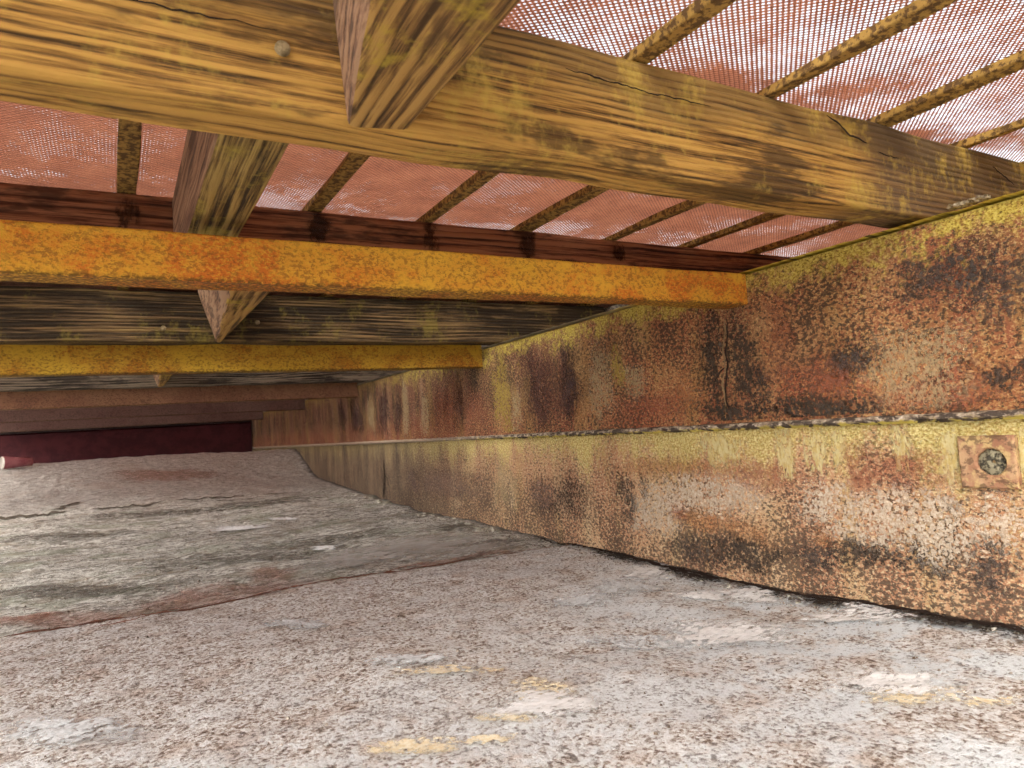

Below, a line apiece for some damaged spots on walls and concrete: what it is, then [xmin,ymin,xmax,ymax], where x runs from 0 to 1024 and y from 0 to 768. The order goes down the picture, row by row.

crack [712,316,729,413]
leakage [556,497,1020,606]